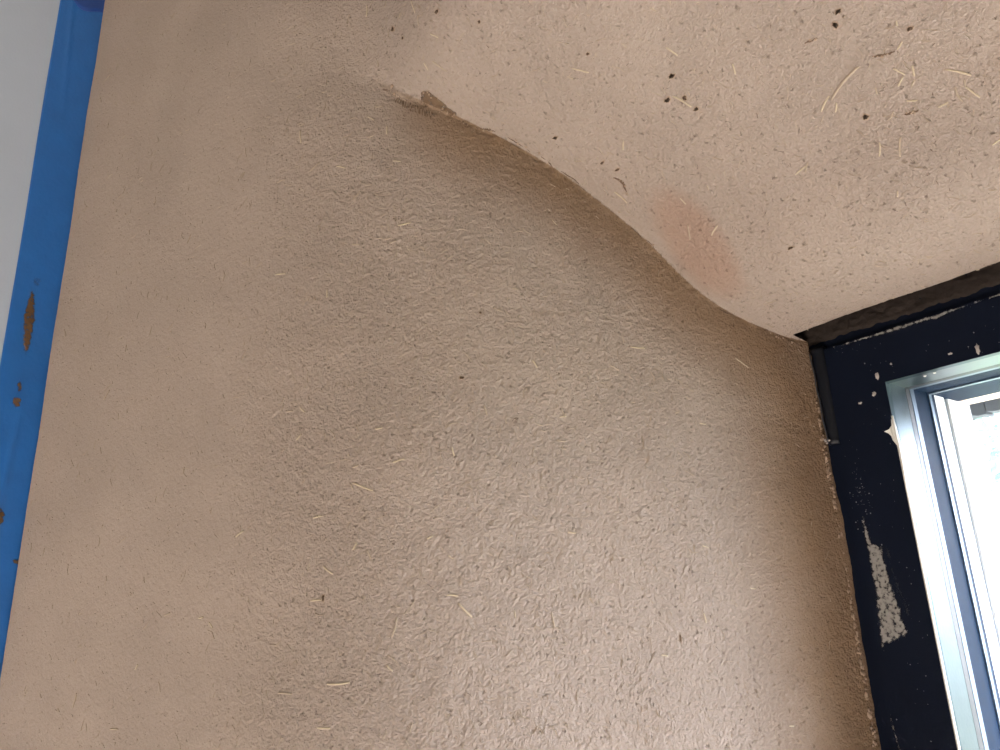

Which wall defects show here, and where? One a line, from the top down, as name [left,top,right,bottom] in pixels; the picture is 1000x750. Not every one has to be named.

spalling [391,92,456,119]